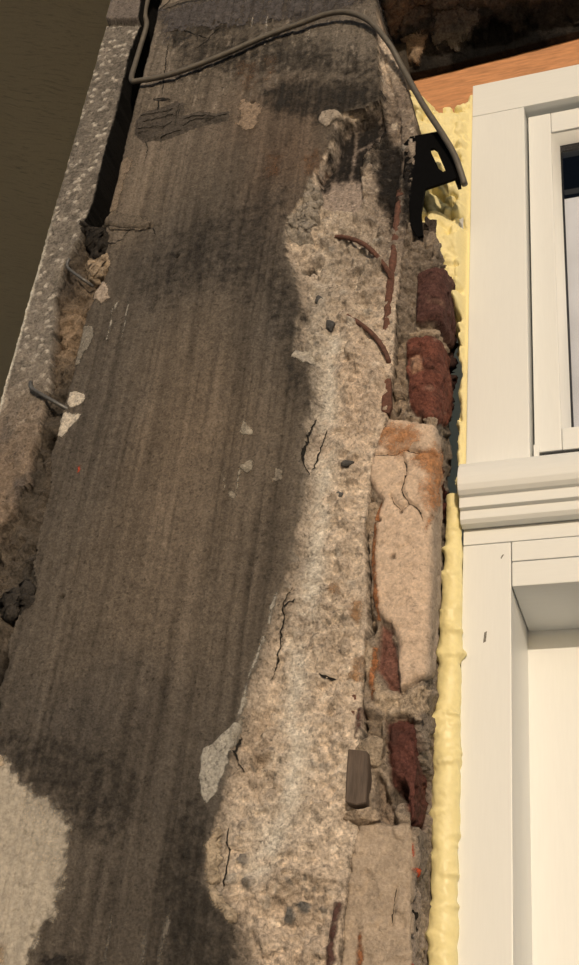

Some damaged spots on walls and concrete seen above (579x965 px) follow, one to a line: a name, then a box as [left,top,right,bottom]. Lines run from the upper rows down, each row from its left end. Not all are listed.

peeling [75,326,94,367]
peeling [58,391,85,437]
crack [301,420,327,475]
spalling [199,0,479,965]
crack [376,450,423,519]
rust [379,425,443,527]
crack [272,587,295,681]
flaking render [0,755,70,965]